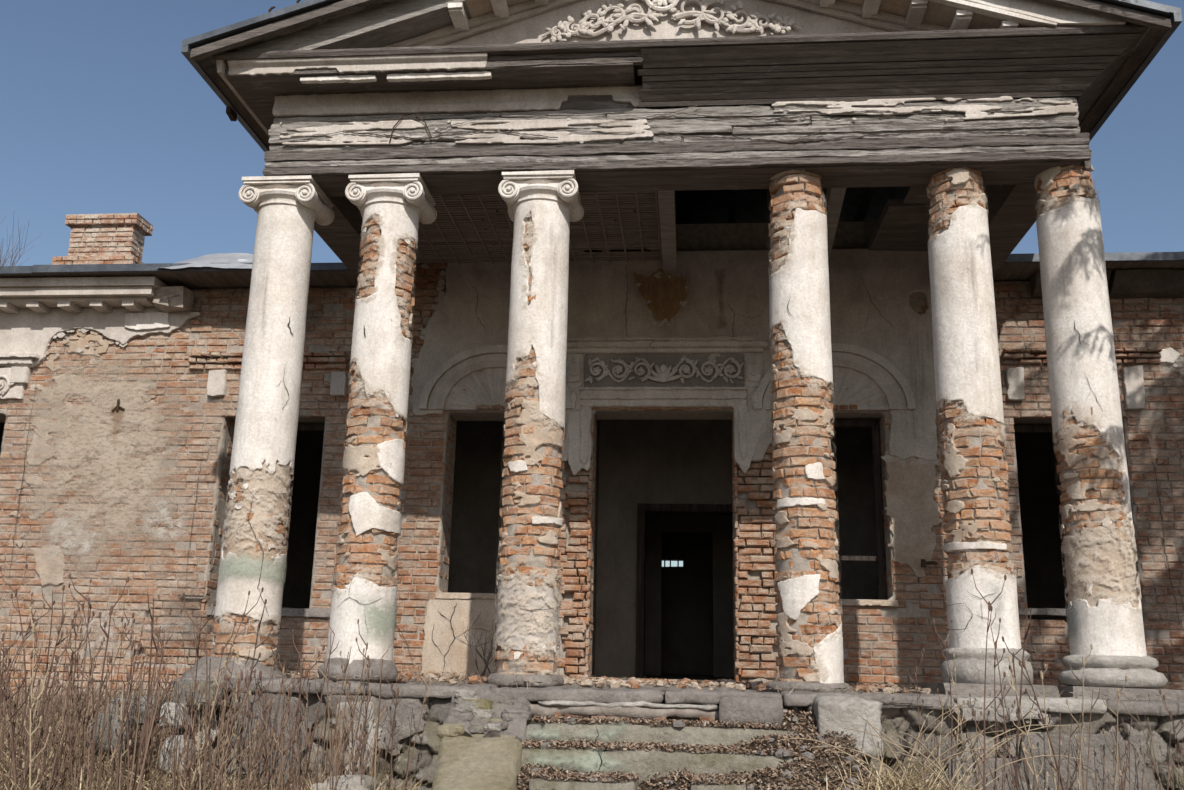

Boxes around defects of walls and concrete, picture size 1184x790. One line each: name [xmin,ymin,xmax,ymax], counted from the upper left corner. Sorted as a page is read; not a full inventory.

peeling [280,118,654,145]
peeling [771,96,1078,121]
peeling [46,312,171,357]
flaking render [355,212,446,380]
peeling [15,540,65,586]
spalling [133,594,281,668]
peeling [221,460,294,564]
flaking render [331,357,413,591]
peeling [476,350,594,677]
spalling [732,320,858,684]
flaking render [881,400,1017,582]
flaking render [1053,404,1142,610]